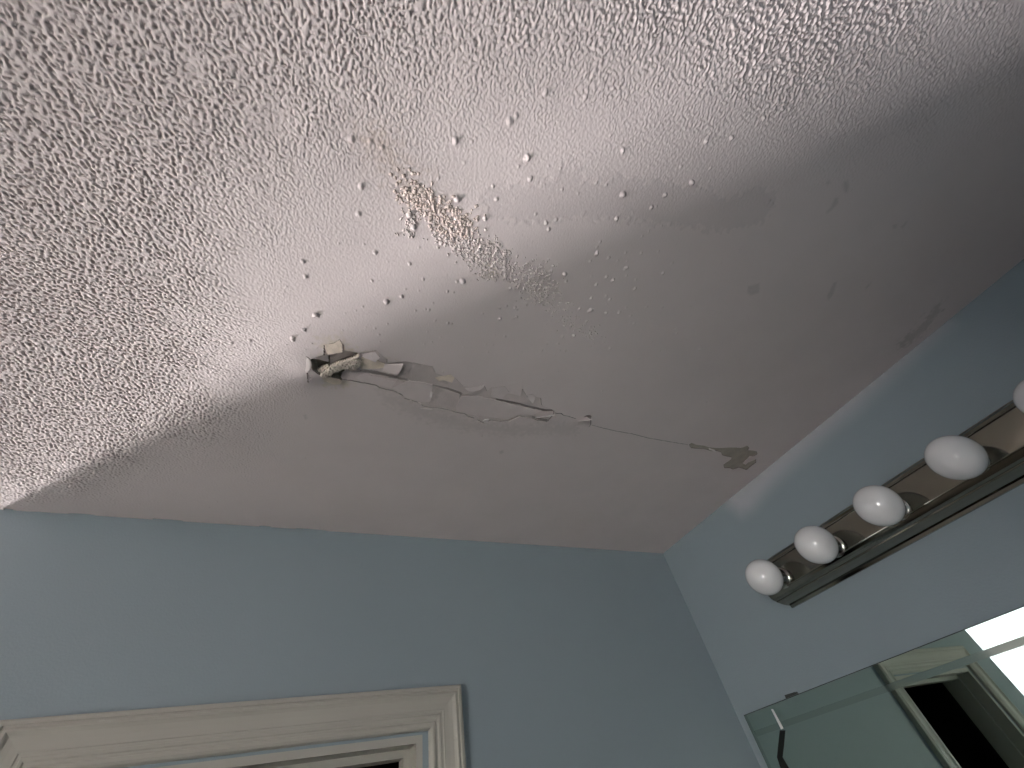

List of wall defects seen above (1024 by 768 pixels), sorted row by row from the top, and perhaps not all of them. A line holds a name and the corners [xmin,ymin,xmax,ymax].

peeling [305,340,576,423]
crack [578,415,688,445]
peeling [689,443,757,473]